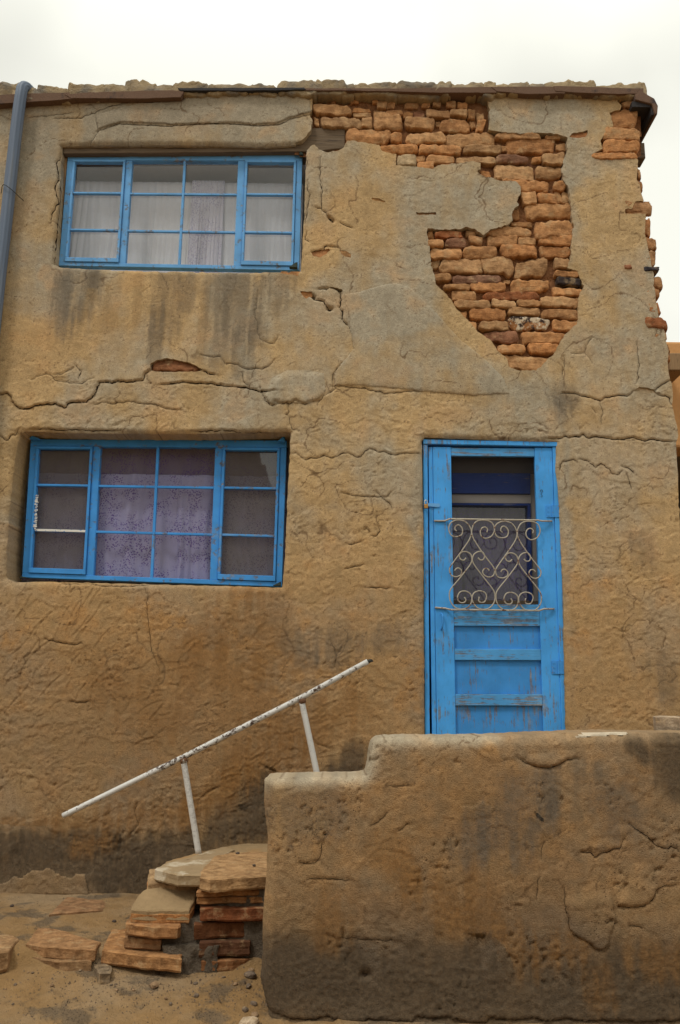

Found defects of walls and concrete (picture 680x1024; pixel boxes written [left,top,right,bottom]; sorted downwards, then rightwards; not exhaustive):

flaking render [592,100,642,160]
flaking render [311,100,587,371]
flaking render [626,202,652,217]
flaking render [152,360,200,372]
crack [2,302,411,460]
crack [557,339,672,489]
damp [0,774,268,894]
crack [584,828,674,858]
damp [262,942,680,1024]